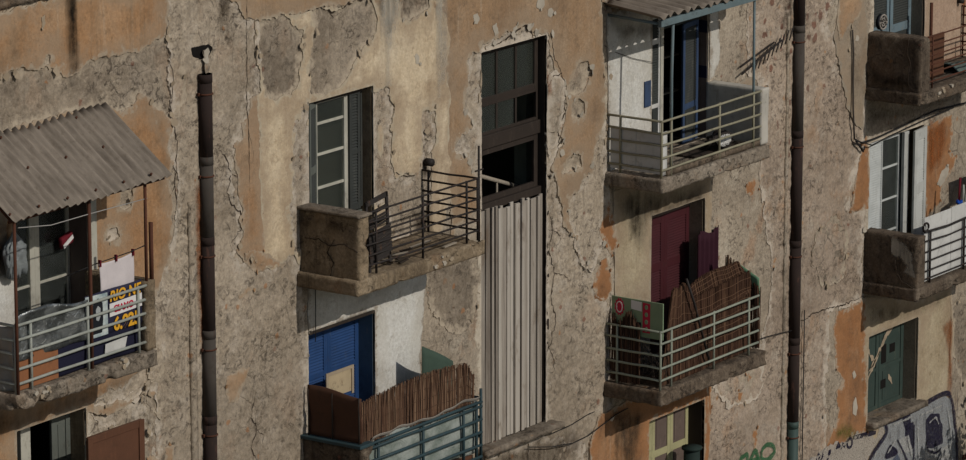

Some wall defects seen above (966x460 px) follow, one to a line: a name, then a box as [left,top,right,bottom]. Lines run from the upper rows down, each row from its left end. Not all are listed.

spalling [0,0,377,460]
crack [306,238,358,276]
spalling [454,22,619,460]
spalling [702,0,870,460]
peeling [891,237,915,278]
peeling [925,115,957,217]